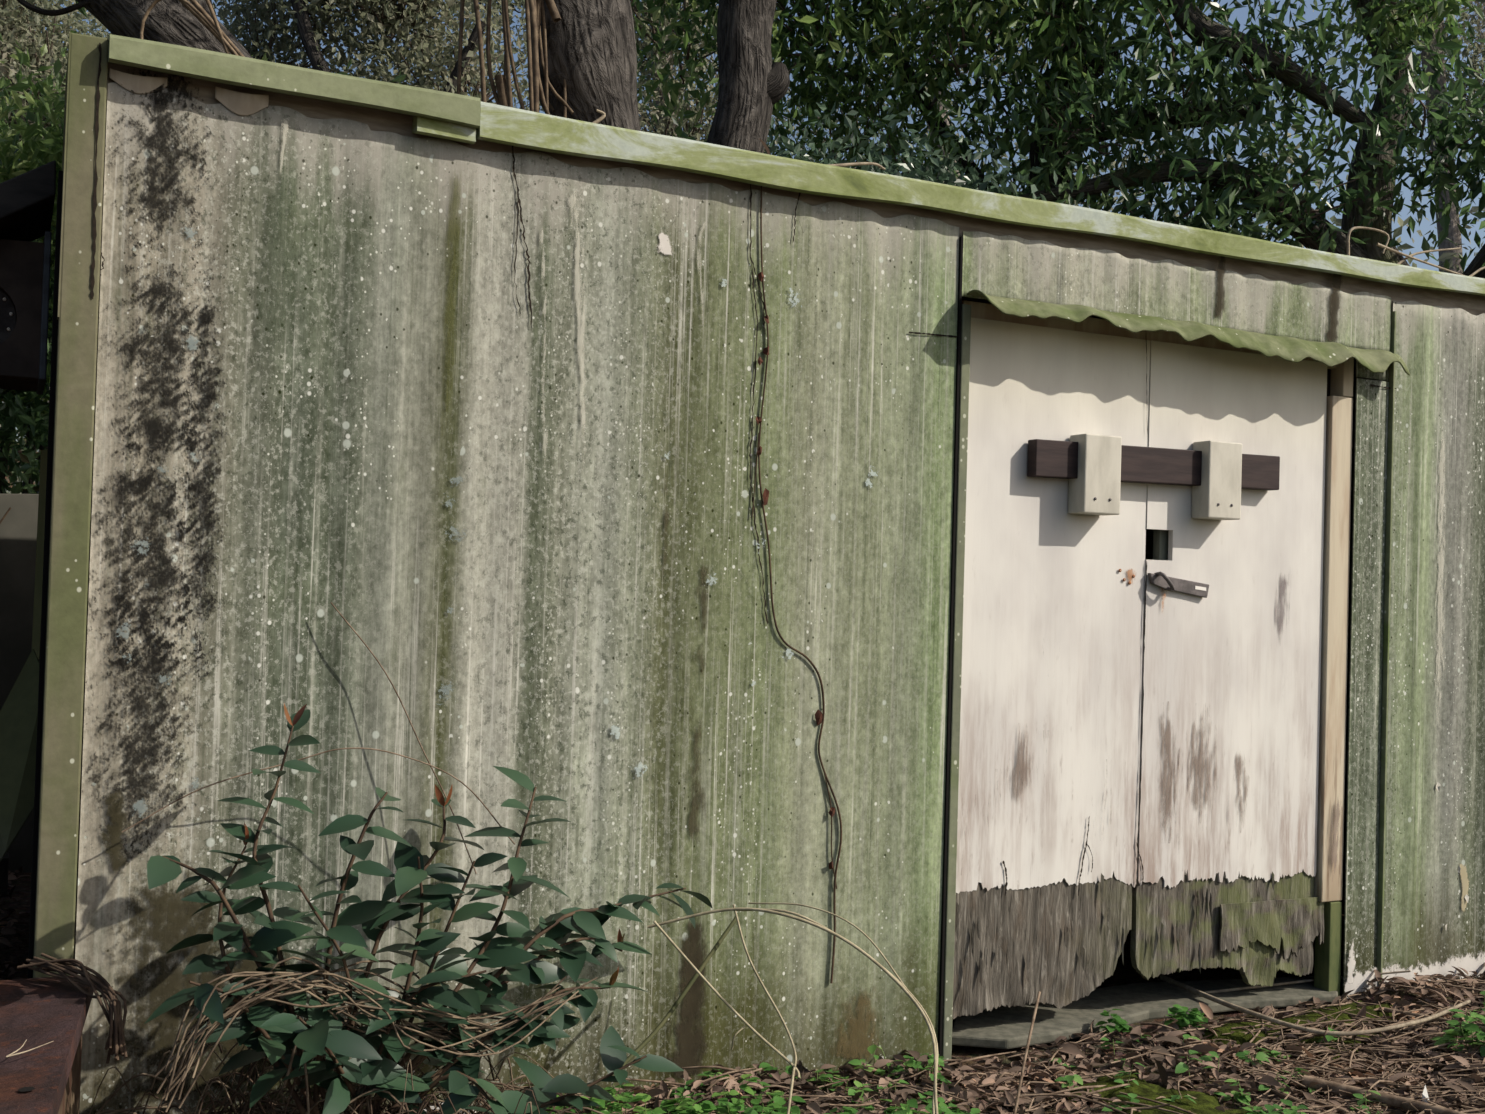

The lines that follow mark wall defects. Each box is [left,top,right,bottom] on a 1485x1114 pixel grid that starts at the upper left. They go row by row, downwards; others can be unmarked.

crack [793,193,803,242]
crack [749,185,768,624]
water stain [82,70,233,874]
water stain [1013,732,1031,796]
water stain [1161,718,1217,839]
water stain [1236,755,1248,814]
water stain [87,862,303,1114]